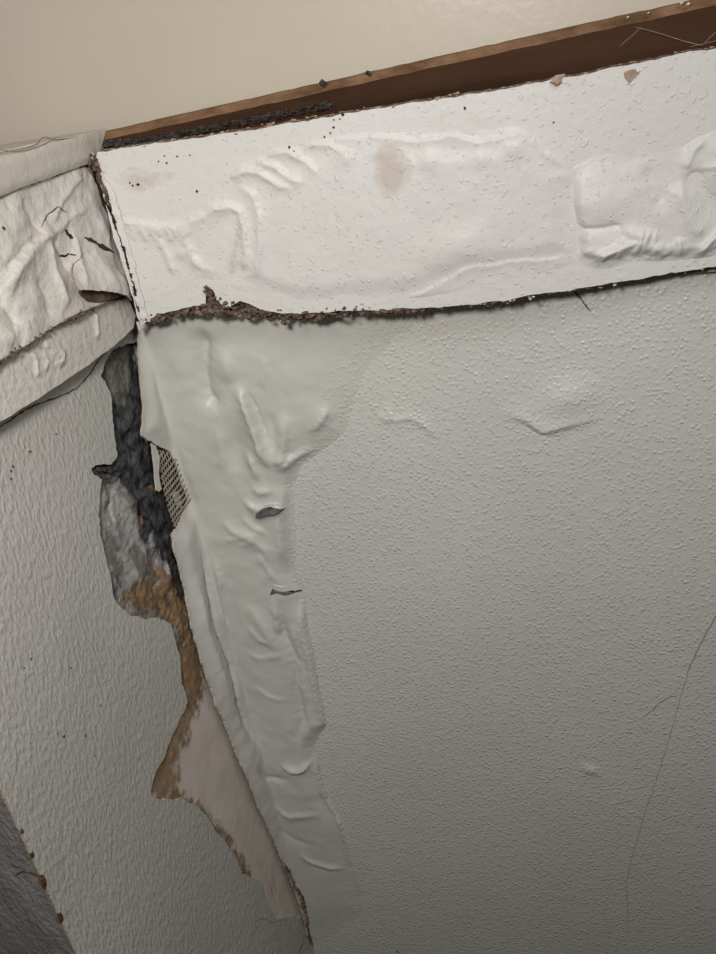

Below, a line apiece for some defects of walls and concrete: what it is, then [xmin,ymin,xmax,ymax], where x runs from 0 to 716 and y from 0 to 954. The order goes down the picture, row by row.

peeling [0,166,133,365]
peeling [91,285,428,940]
crack [625,616,716,935]